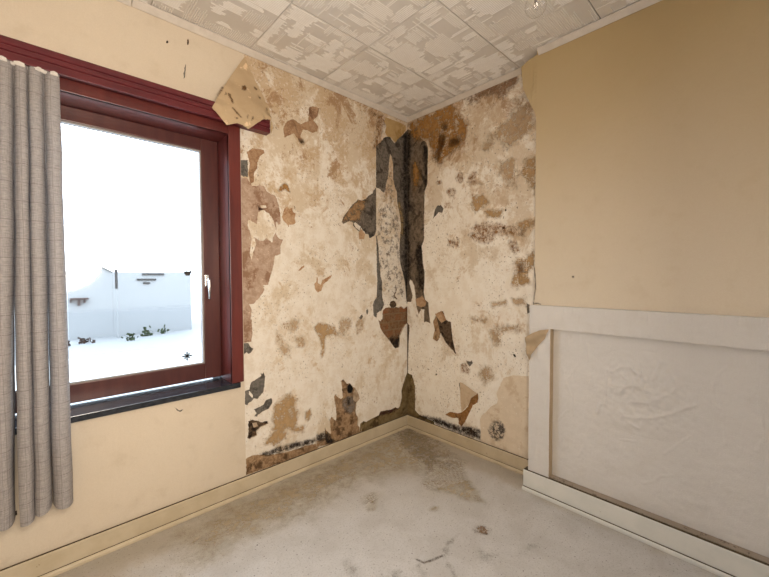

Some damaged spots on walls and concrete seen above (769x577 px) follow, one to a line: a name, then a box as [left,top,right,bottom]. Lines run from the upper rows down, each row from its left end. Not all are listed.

peeling [212,57,273,134]
peeling [293,107,319,136]
flaking render [342,188,377,239]
damp [376,128,430,323]
flaking render [314,275,332,292]
flaking render [359,300,407,349]
peeling [433,311,446,341]
peeling [460,382,477,412]
damp [262,396,328,455]
flaking render [246,373,434,475]
damp [423,416,505,441]